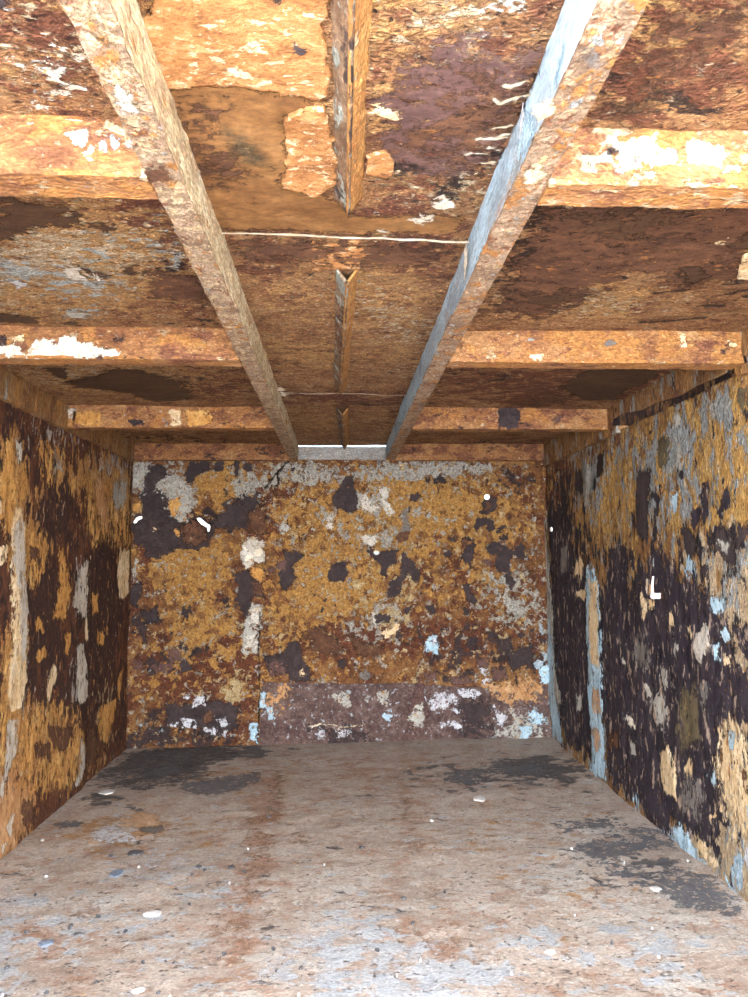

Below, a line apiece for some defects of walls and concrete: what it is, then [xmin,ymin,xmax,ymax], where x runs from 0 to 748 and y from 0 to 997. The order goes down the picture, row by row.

rust [366,31,556,179]
peeling [591,147,620,168]
peeling [686,140,741,175]
peeling [0,196,117,252]
peeling [0,313,46,346]
rust [0,430,132,599]
rust [0,527,123,859]
leakage [107,694,259,793]
leakage [477,758,566,782]
rust [712,713,748,855]
leakage [550,809,670,840]
leakage [647,858,726,896]